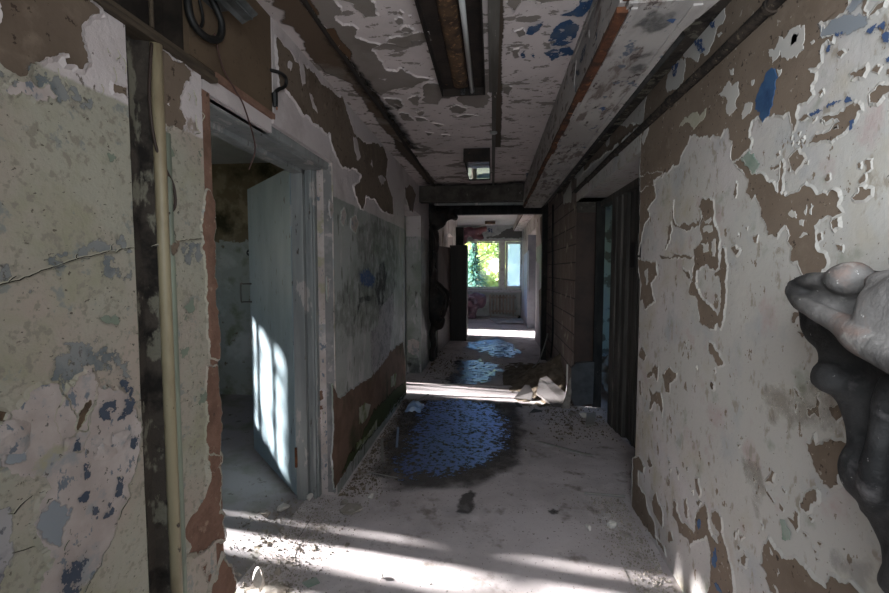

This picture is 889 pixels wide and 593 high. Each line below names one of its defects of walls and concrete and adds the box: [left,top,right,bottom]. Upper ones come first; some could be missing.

peeling [0,0,106,82]
peeling [109,80,128,100]
peeling [163,50,193,134]
peeling [274,34,394,216]
peeling [311,0,492,137]
crack [0,231,202,286]
peeling [563,0,889,392]
spalling [74,399,92,433]
spalling [185,188,237,593]
peeling [639,346,678,418]
peeling [631,454,749,593]
peeling [752,381,866,593]